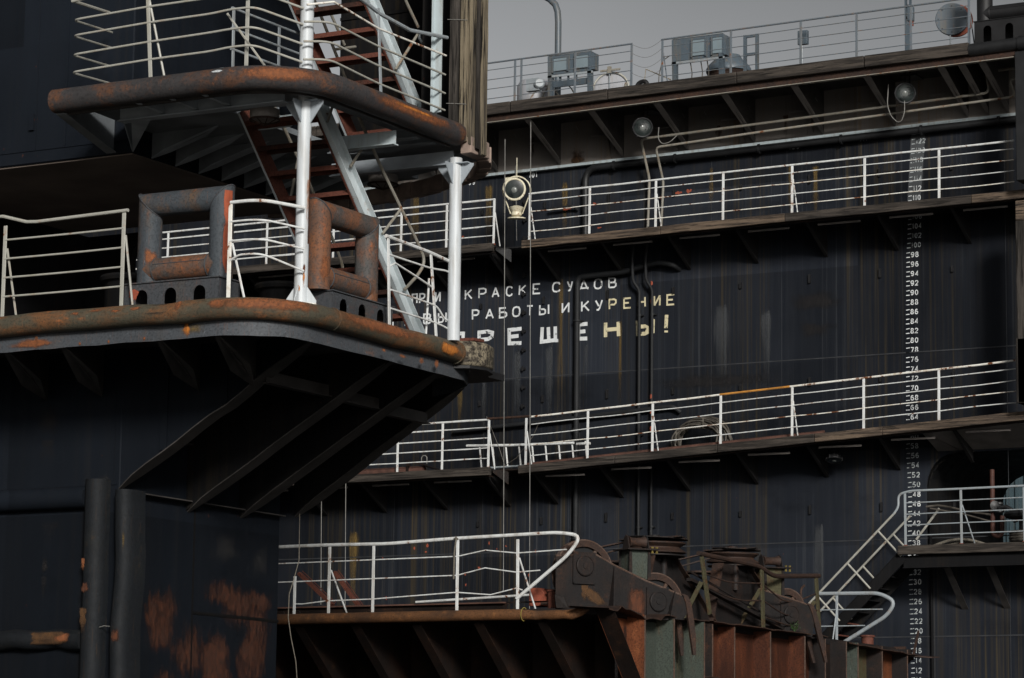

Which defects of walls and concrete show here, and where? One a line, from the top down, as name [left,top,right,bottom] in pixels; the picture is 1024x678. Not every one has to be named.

rust [245,67,312,80]
rust [349,315,417,339]
rust [15,336,50,347]
rust [581,585,603,604]
rust [629,590,643,614]
rust [31,632,68,644]
rust [146,584,268,678]